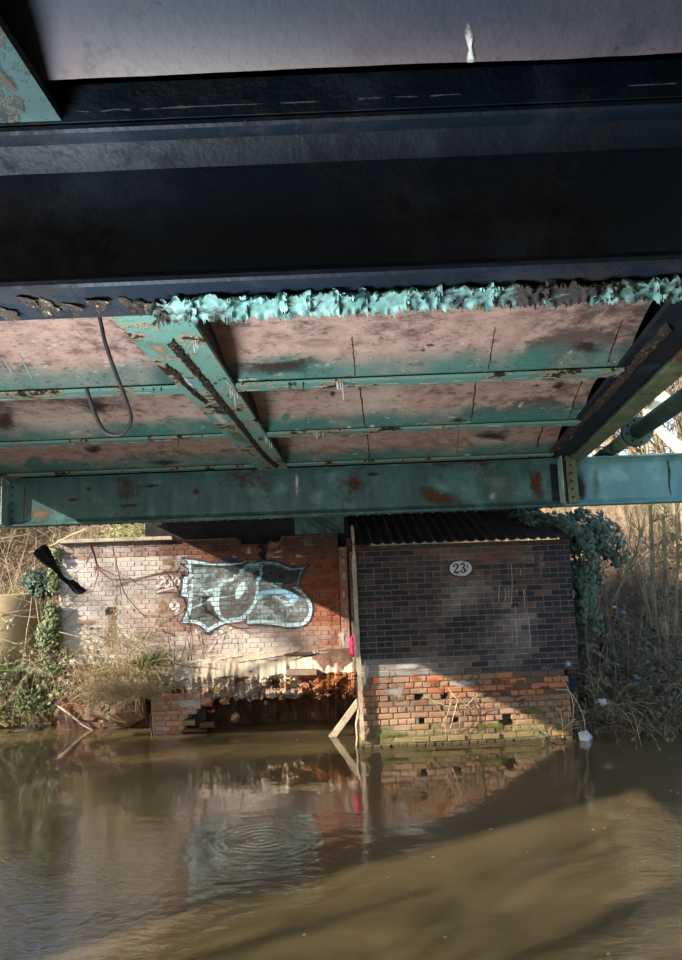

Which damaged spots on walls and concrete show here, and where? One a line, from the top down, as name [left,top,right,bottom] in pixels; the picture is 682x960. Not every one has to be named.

rust [0,297,166,322]
rust [163,338,278,468]
rust [530,472,542,497]